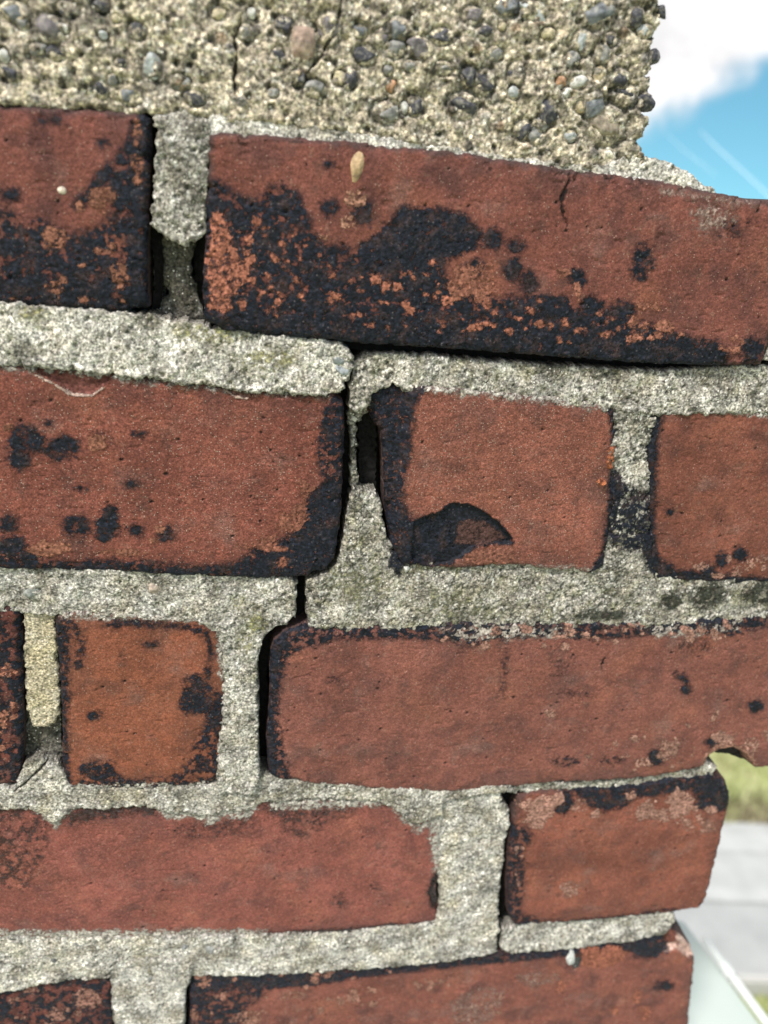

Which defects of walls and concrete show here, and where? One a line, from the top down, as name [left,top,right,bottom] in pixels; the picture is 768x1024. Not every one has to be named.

crack [560,172,587,227]
crack [336,382,387,547]
crack [295,575,305,615]
crack [258,629,273,758]
peeling [610,709,768,772]
crack [501,792,512,806]
crack [497,842,509,942]